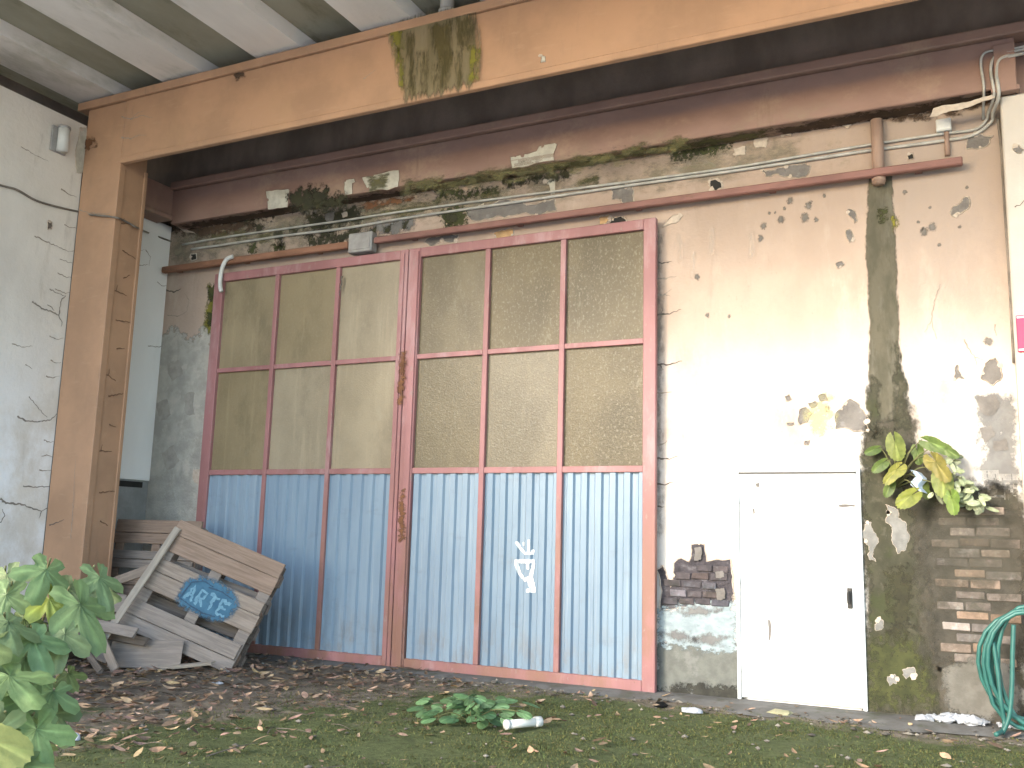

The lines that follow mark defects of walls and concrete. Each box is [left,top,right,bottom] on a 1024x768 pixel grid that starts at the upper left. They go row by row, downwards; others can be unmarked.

water stain [388,7,481,103]
water stain [169,173,536,237]
crack [115,250,135,323]
crack [32,289,65,363]
crack [17,397,58,422]
peeling [145,325,211,521]
rust [397,351,407,405]
spalling [784,393,870,432]
water stain [861,176,1024,725]
rust [398,489,406,542]
flaking render [657,542,737,654]
flaking render [862,502,1024,672]